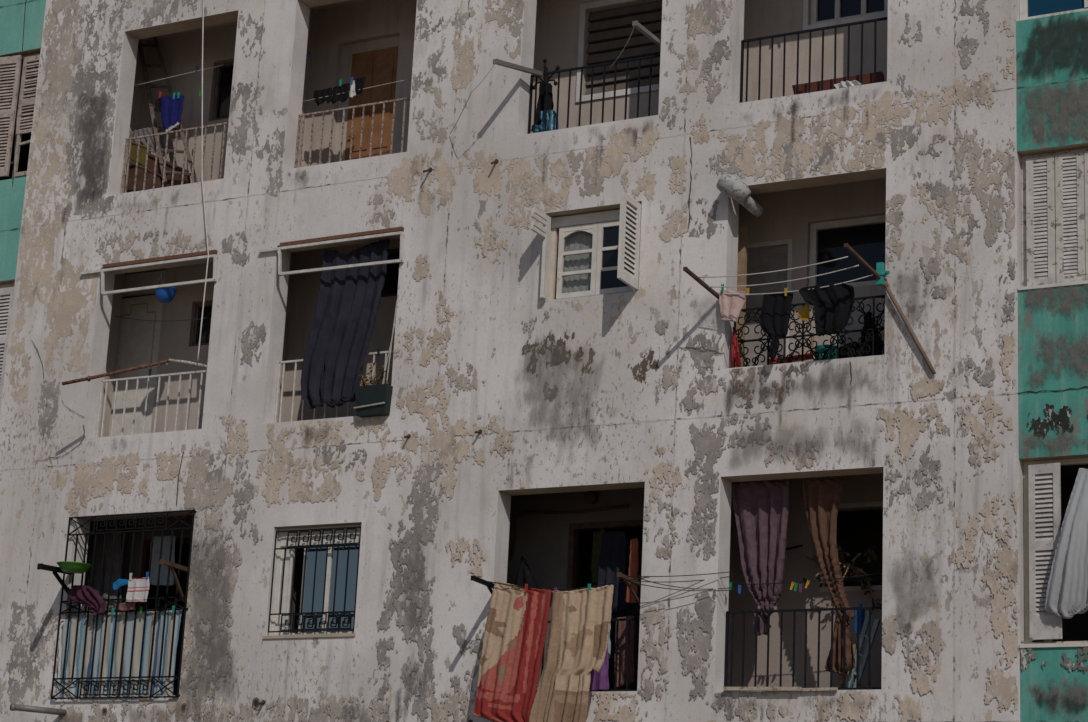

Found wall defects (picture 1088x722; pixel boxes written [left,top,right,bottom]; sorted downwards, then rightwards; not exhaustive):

leakage [1017,11,1088,77]
leakage [80,95,106,199]
peeling [230,82,285,197]
peeling [368,0,1088,515]
peeling [628,329,821,560]
peeling [0,290,526,722]
peeling [591,589,785,722]
peeling [814,691,874,722]
peeling [882,615,943,722]
peeling [1033,641,1088,711]